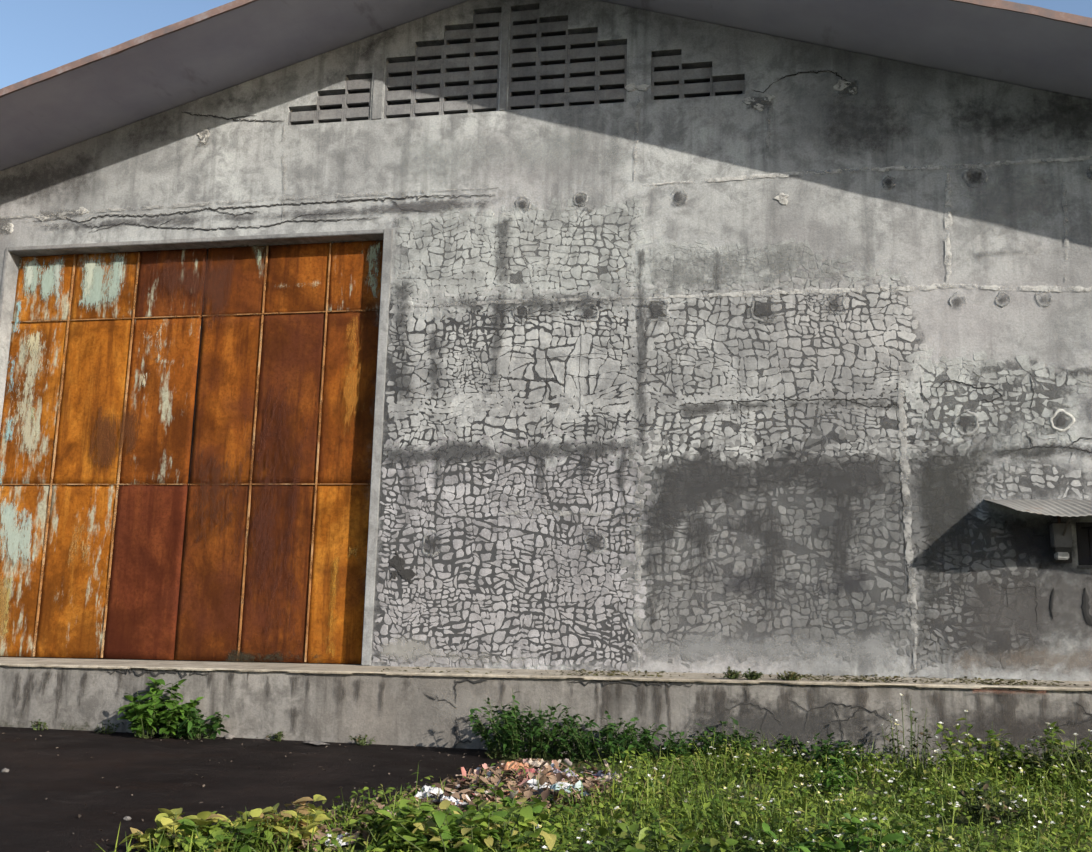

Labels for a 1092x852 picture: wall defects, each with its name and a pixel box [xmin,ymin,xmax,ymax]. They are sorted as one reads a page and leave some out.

crack [34,194,493,233]
peeling [79,254,124,309]
peeling [1,257,64,455]
corrosion [344,317,361,422]
crack [681,378,1002,408]
corrosion [89,403,139,475]
leakage [642,448,889,602]
leakage [921,449,985,569]
peeling [0,499,36,634]
corrosion [228,650,299,663]
leakage [13,671,64,715]
crack [425,678,490,748]